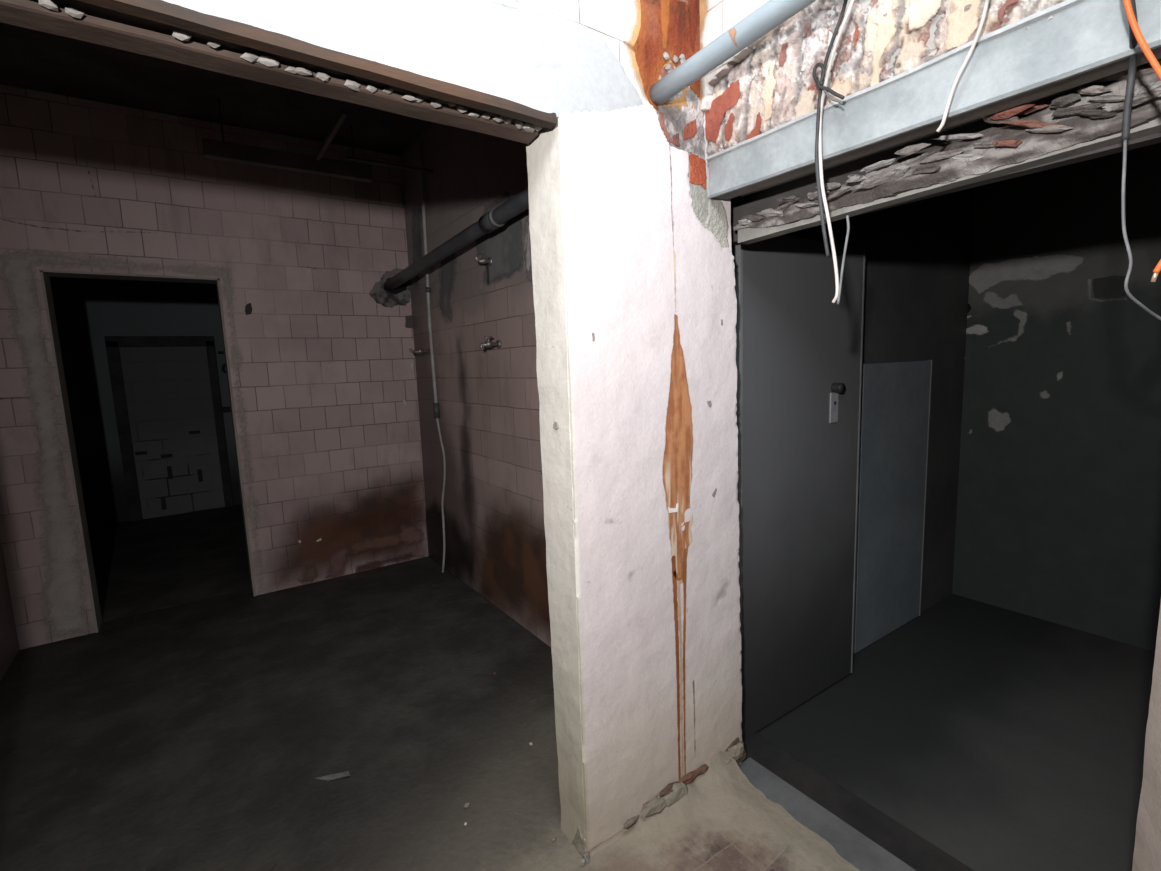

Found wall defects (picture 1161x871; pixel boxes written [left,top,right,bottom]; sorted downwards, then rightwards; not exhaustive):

rust [628,0,707,110]
flaking render [656,0,1161,248]
peeling [522,215,533,282]
water stain [283,429,551,629]
rust [663,290,695,780]